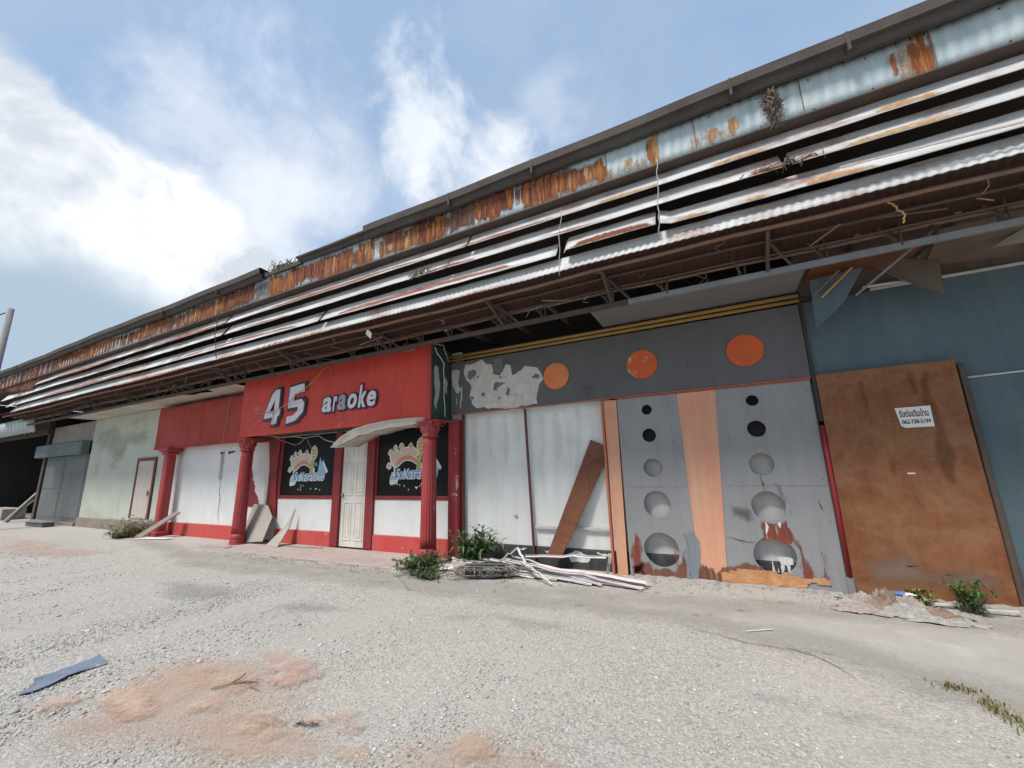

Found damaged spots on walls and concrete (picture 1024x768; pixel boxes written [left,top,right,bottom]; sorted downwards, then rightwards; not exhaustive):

rust [890,33,935,76]
rust [876,92,941,112]
rust [692,117,739,144]
rust [713,149,762,166]
rust [0,132,659,397]
peeling [434,358,543,410]